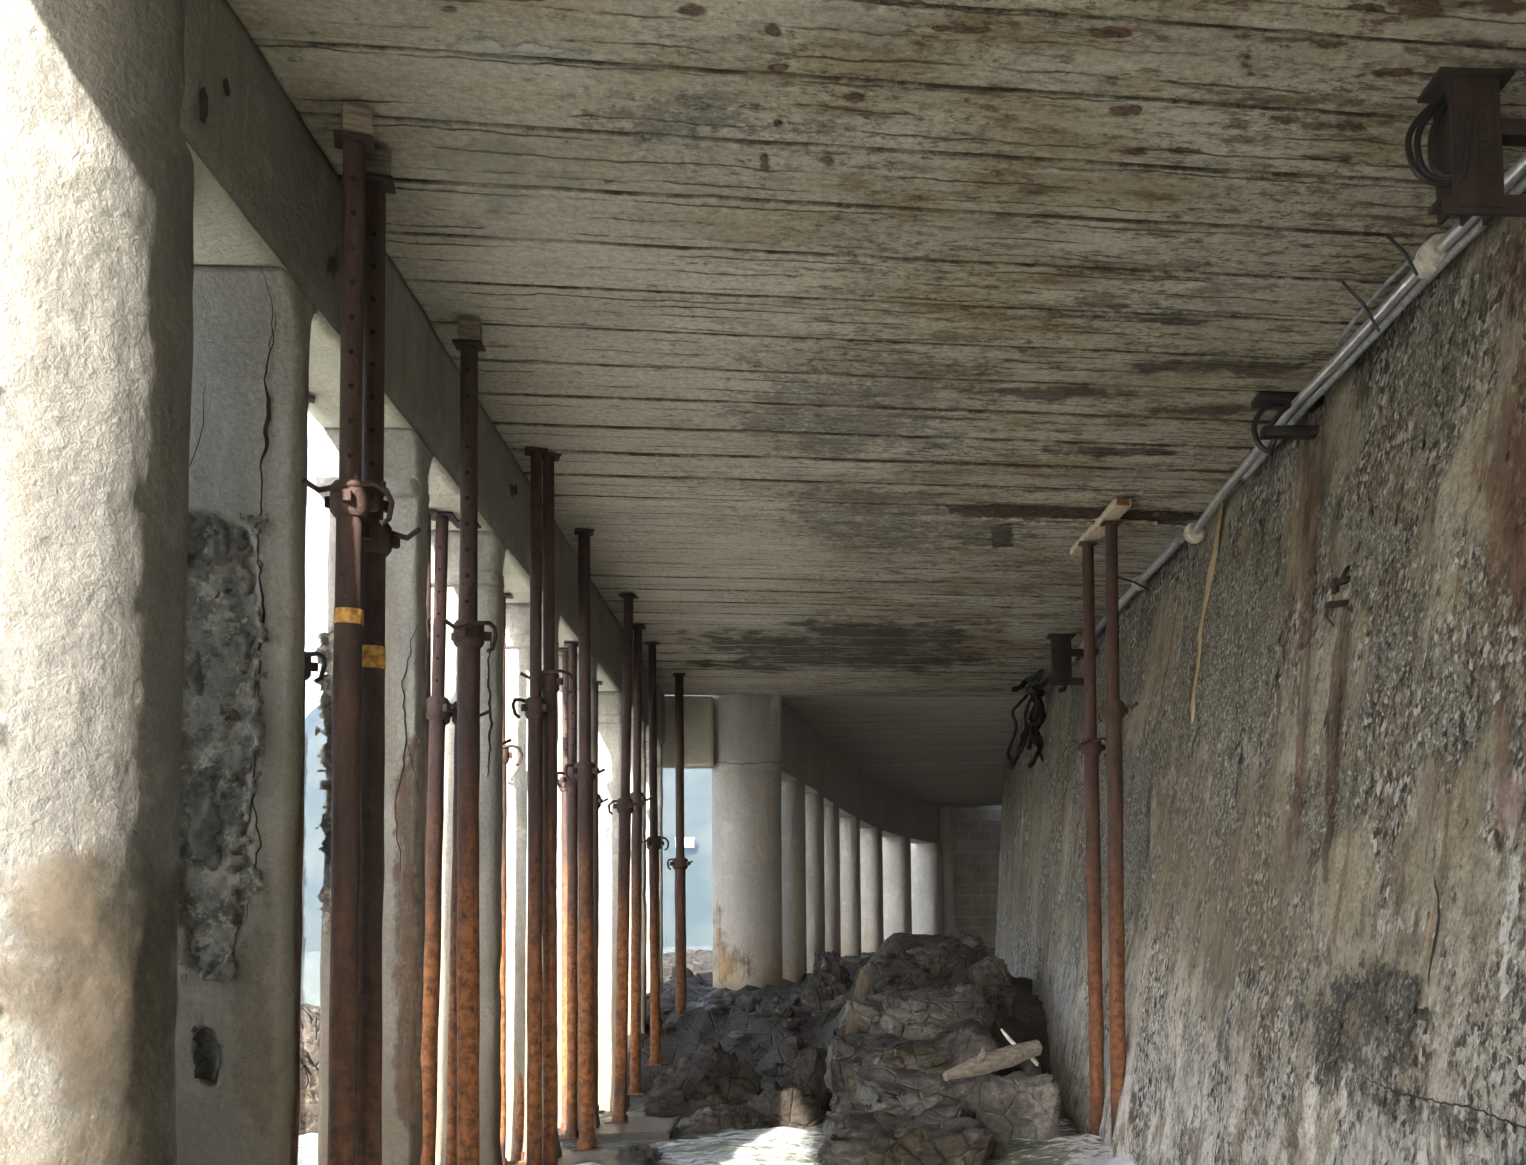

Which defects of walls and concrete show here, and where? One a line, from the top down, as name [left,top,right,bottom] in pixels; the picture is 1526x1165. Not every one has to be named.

spalling [178,511,269,981]
crack [243,754,262,926]
crack [256,264,276,697]
rust [1289,397,1324,843]
rust [1322,602,1346,885]
spalling [191,1026,221,1082]
leakage [1033,945,1107,1142]
leakage [1301,908,1526,1165]